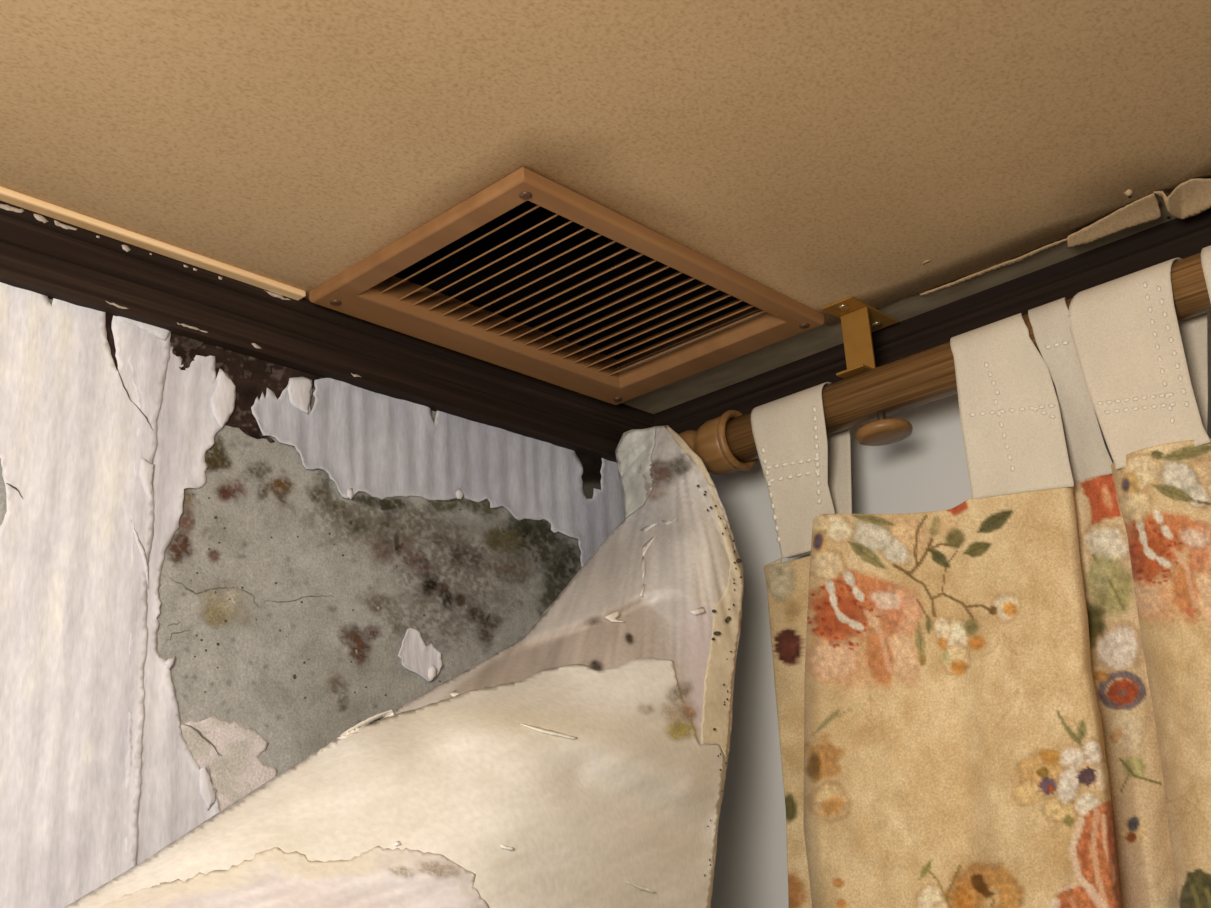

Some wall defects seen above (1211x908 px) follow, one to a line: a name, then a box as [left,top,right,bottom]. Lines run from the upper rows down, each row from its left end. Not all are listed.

mould [192,484,242,499]
mould [205,440,231,469]
mould [649,459,689,498]
spalling [131,369,582,776]
water stain [311,479,581,642]
mould [697,485,742,640]
water stain [648,687,694,738]
peeling [199,766,216,810]